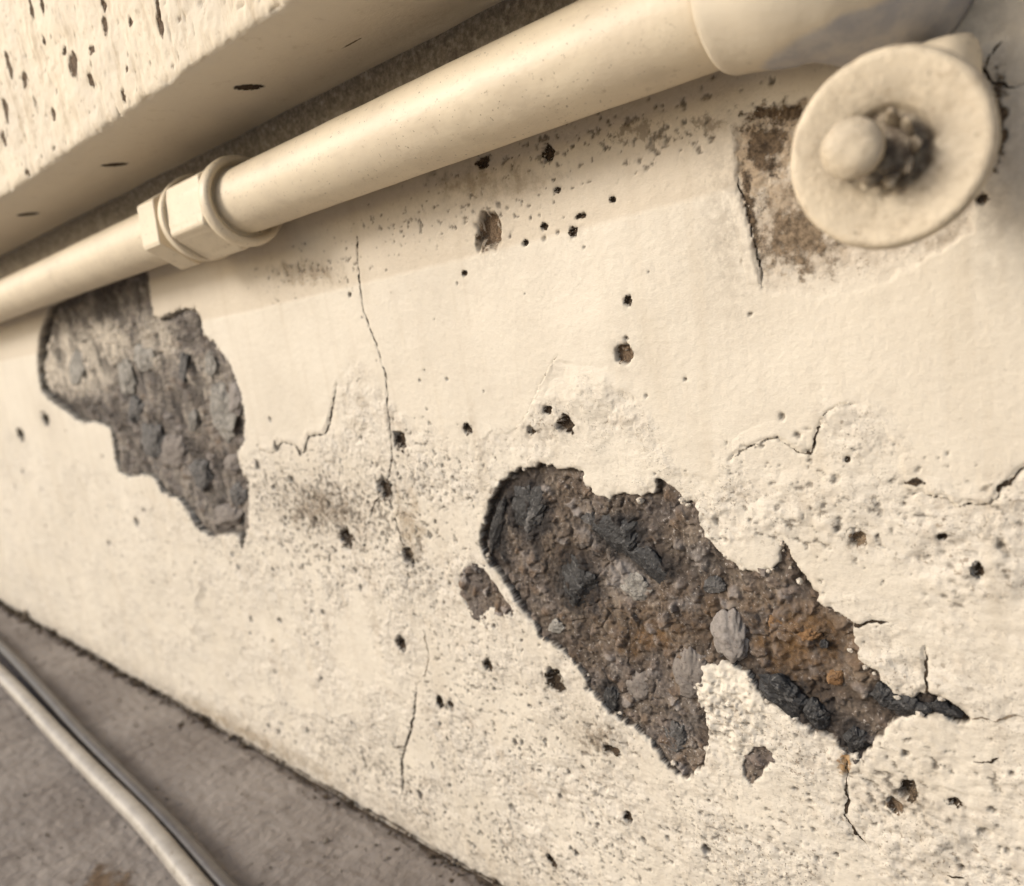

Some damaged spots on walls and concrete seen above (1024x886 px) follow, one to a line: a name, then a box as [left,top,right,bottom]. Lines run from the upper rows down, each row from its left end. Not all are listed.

crack [737,179,762,287]
spalling [44,271,250,535]
crack [277,389,336,456]
crack [356,236,410,591]
crack [730,404,851,460]
peeling [904,475,1000,507]
spalling [458,464,968,775]
spalling [744,747,775,784]
crack [844,759,870,850]